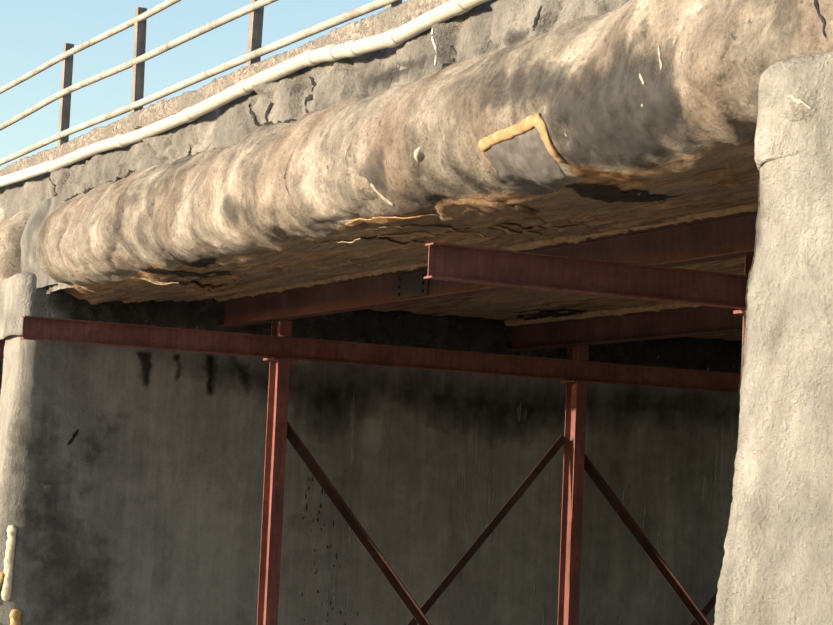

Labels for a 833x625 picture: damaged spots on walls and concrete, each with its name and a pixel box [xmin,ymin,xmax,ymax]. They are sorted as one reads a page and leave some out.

crack [248,76,317,127]
damp [503,40,687,166]
spalling [564,166,678,203]
peeling [317,197,601,246]
spalling [140,252,245,292]
spalling [514,309,587,321]
damp [137,351,151,386]
damp [700,437,736,513]
crack [0,525,23,625]